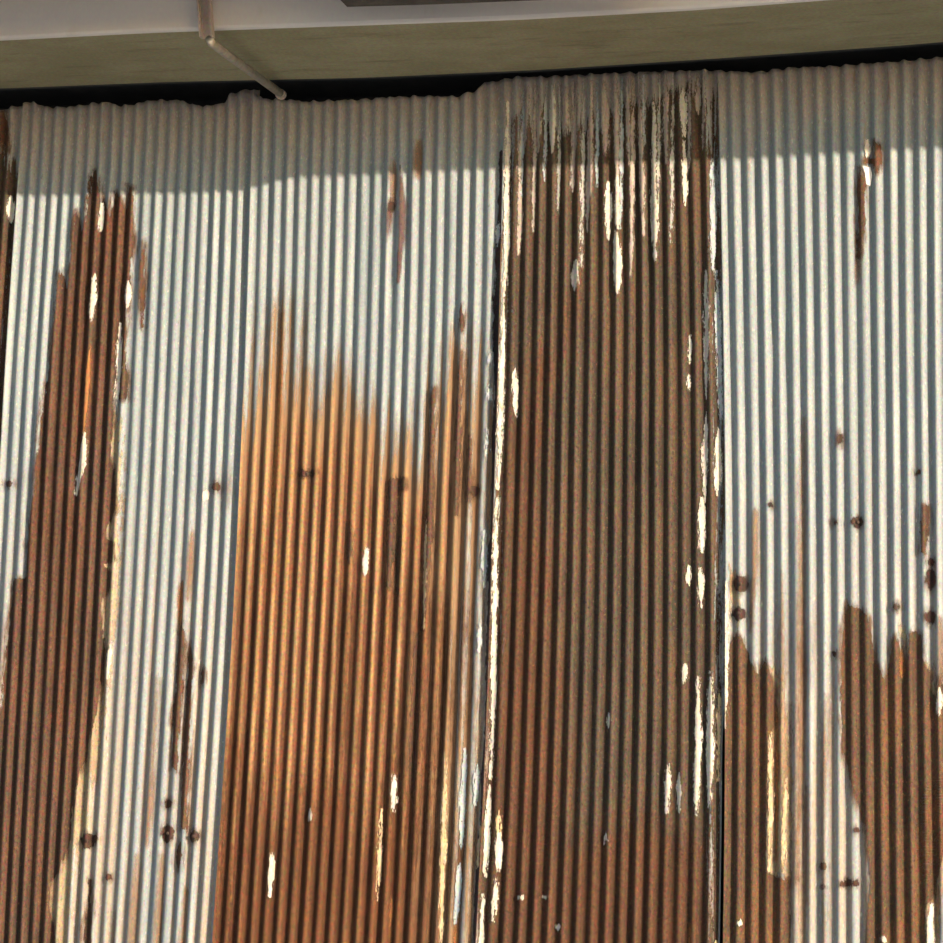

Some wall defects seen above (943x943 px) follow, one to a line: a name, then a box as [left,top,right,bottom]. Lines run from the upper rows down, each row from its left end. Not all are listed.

rust [854,139,883,274]
rust [0,110,18,446]
rust [0,169,148,943]
rust [202,482,221,502]
rust [212,70,807,943]
rust [850,516,863,529]
rust [918,503,936,591]
rust [832,601,943,943]
rust [155,856,163,943]
rust [819,846,827,943]